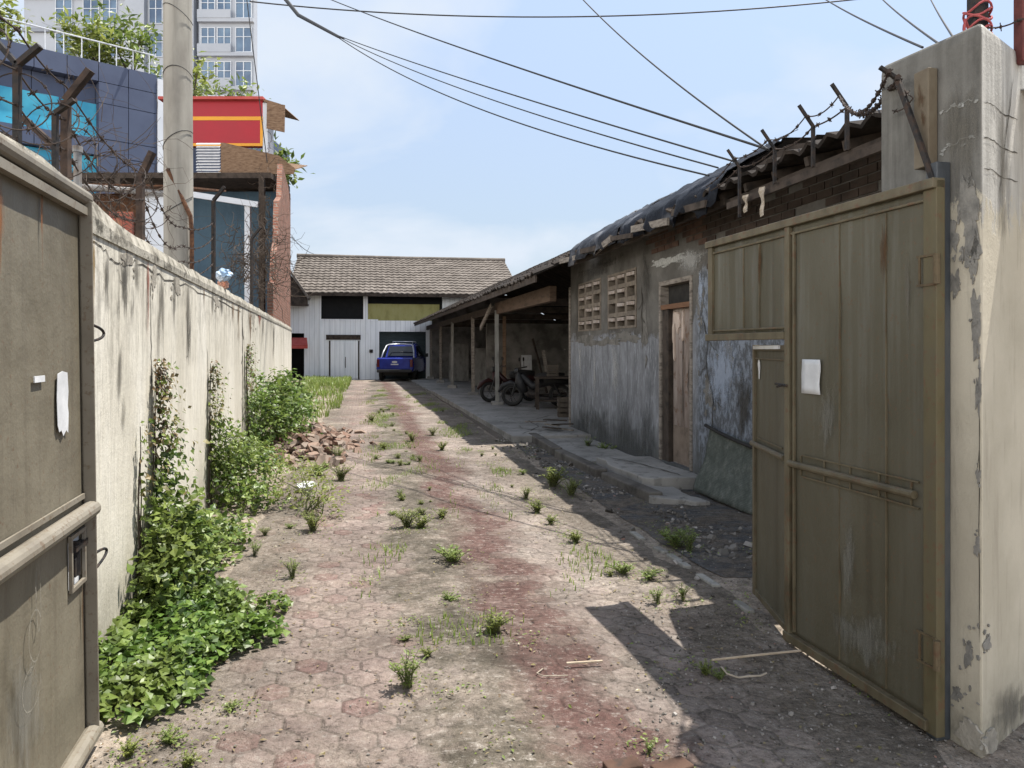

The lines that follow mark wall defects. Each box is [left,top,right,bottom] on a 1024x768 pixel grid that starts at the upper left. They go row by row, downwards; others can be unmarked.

crack [984,84,1018,228]
leakage [122,255,138,311]
leakage [161,281,191,348]
leakage [204,292,274,344]
peeling [950,167,983,417]
leakage [737,379,750,436]
peeling [959,623,992,670]
spalling [950,685,998,757]